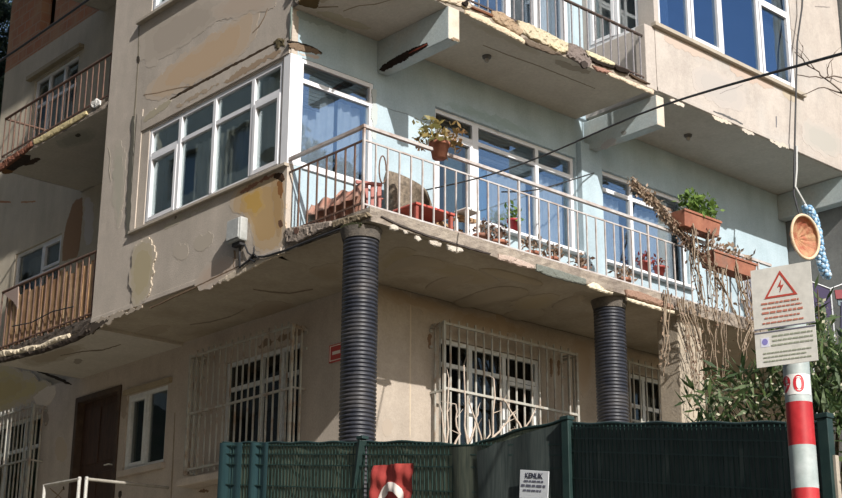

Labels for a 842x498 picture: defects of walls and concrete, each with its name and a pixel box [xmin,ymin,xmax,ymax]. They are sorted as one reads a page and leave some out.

spalling [273,38,322,59]
spalling [379,43,429,72]
spalling [440,0,654,95]
spalling [0,98,101,172]
damp [230,172,287,255]
spalling [389,224,464,254]
spalling [0,327,91,363]